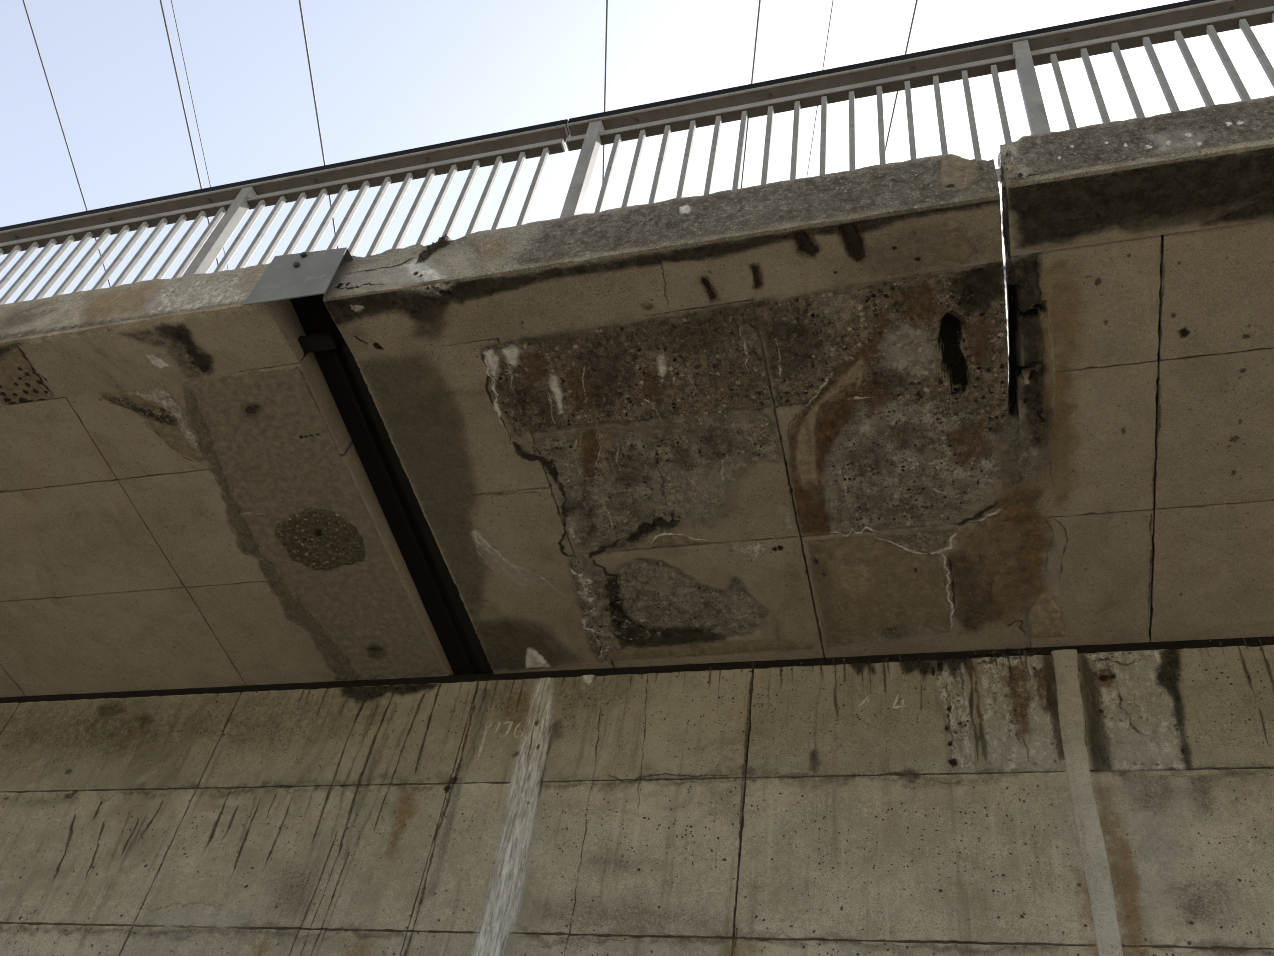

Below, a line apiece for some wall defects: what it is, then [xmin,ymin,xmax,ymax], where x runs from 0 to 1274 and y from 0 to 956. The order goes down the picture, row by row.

water stain [129,325,211,377]
water stain [324,259,453,336]
spalling [1008,285,1027,414]
crack [997,152,1054,490]
spalling [529,408,781,548]
corrosion [788,314,888,534]
spalling [825,309,1008,536]
crack [1148,240,1164,624]
water stain [364,358,570,956]
spalling [603,560,768,647]
water stain [780,647,1064,771]
crack [874,502,1002,630]